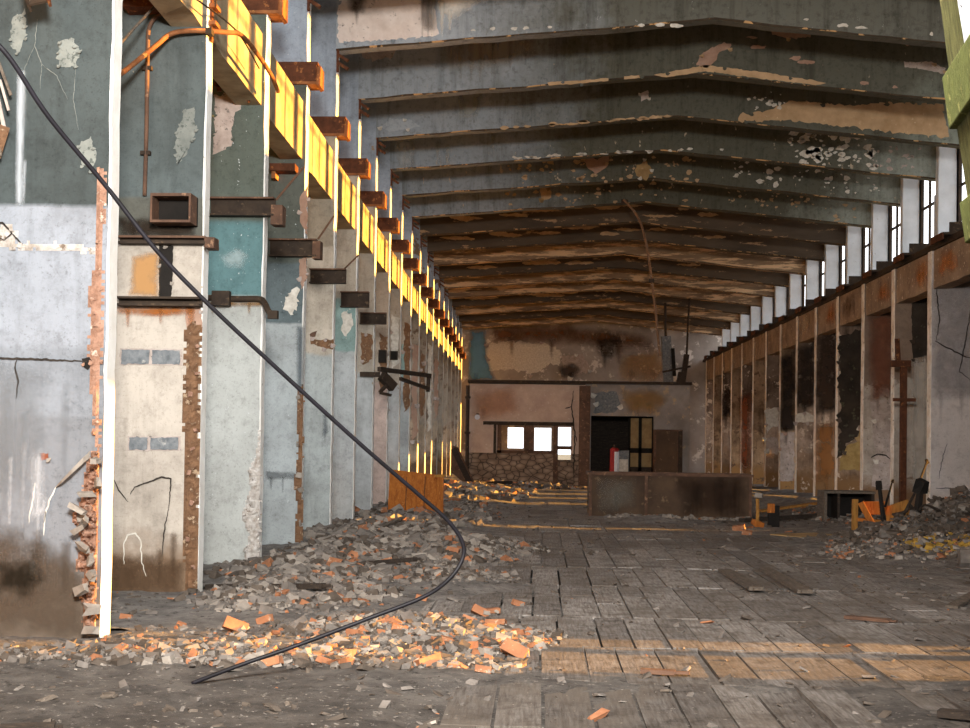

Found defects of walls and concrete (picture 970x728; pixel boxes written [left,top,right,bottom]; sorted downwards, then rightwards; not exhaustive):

peeling [9,9,28,55]
peeling [56,38,82,68]
peeling [624,42,825,85]
peeling [904,61,946,74]
peeling [173,107,199,165]
peeling [210,93,241,159]
peeling [733,92,949,221]
peeling [499,148,718,236]
spalling [0,137,107,634]
spalling [182,307,203,591]
leakage [0,537,82,634]